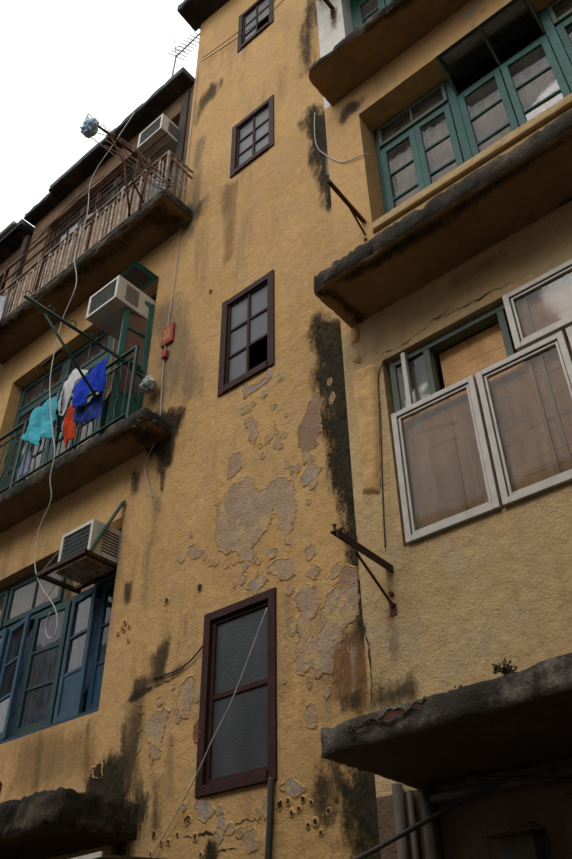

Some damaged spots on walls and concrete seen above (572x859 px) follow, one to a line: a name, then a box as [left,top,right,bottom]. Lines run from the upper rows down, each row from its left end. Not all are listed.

leakage [300,0,317,71]
leakage [340,98,363,123]
leakage [298,105,332,210]
leakage [317,141,564,322]
crack [376,282,510,364]
leakage [106,406,186,491]
leakage [309,313,359,569]
peeling [177,368,360,730]
leakage [353,580,364,644]
leakage [85,640,181,836]
spalling [347,696,432,734]
leakage [369,675,415,707]